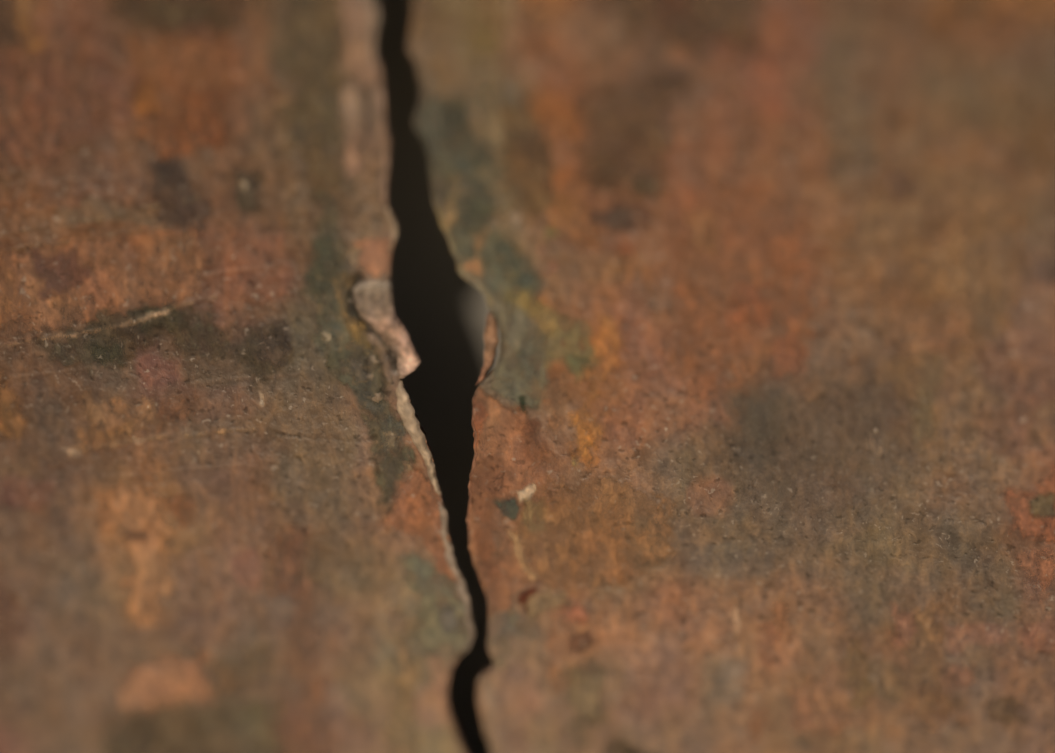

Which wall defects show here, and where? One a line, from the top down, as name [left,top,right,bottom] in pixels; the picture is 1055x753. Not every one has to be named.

rust [347,239,391,277]
rust [0,374,25,438]
crack [367,0,501,753]
rust [466,386,602,614]
rust [1005,468,1055,601]